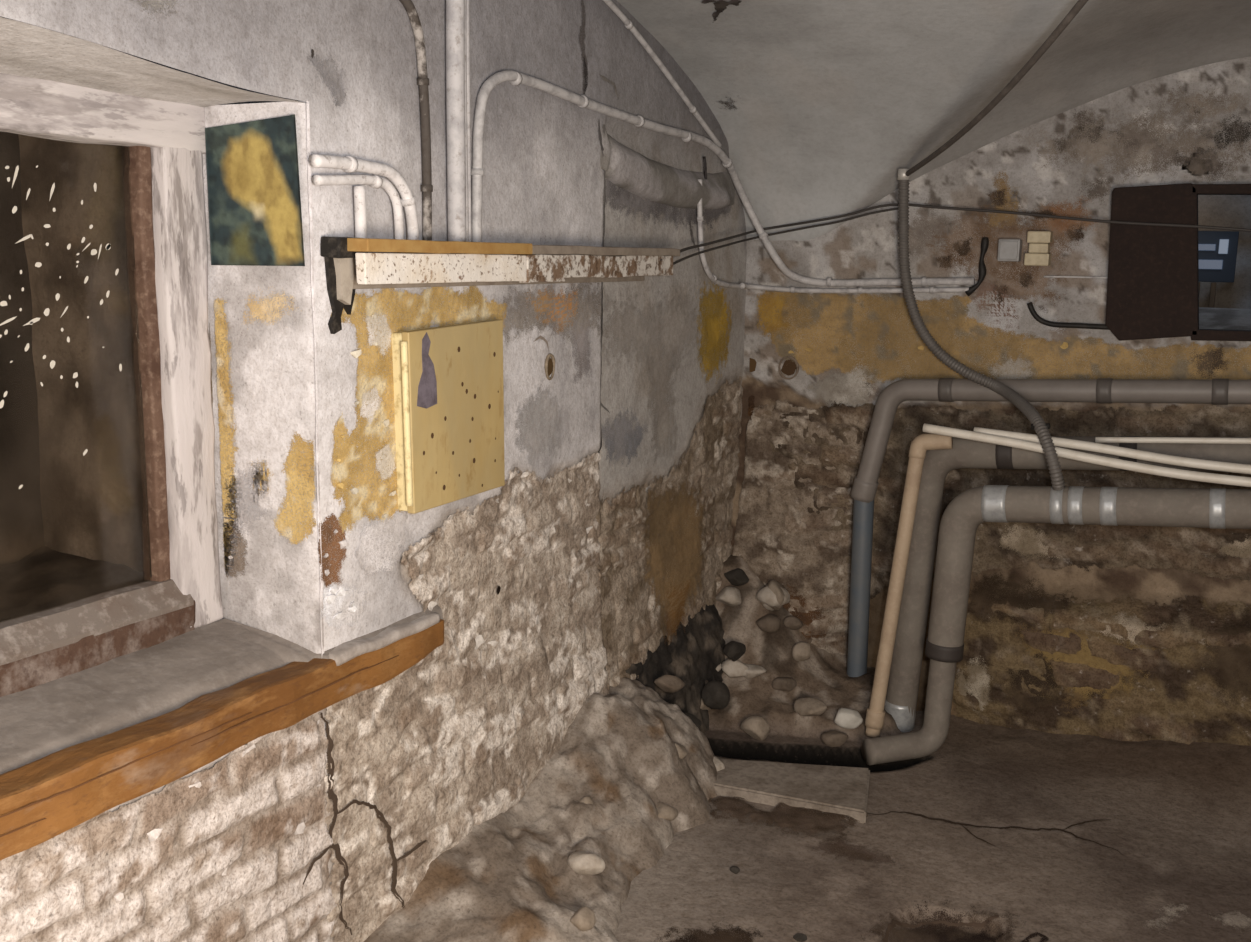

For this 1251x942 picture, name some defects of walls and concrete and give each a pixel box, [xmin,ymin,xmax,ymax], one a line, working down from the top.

crack [578,0,619,247]
damp [1015,81,1251,209]
crack [598,282,610,473]
spalling [0,275,1251,942]
crack [303,712,427,935]
crack [867,811,1123,855]
damp [656,920,763,942]